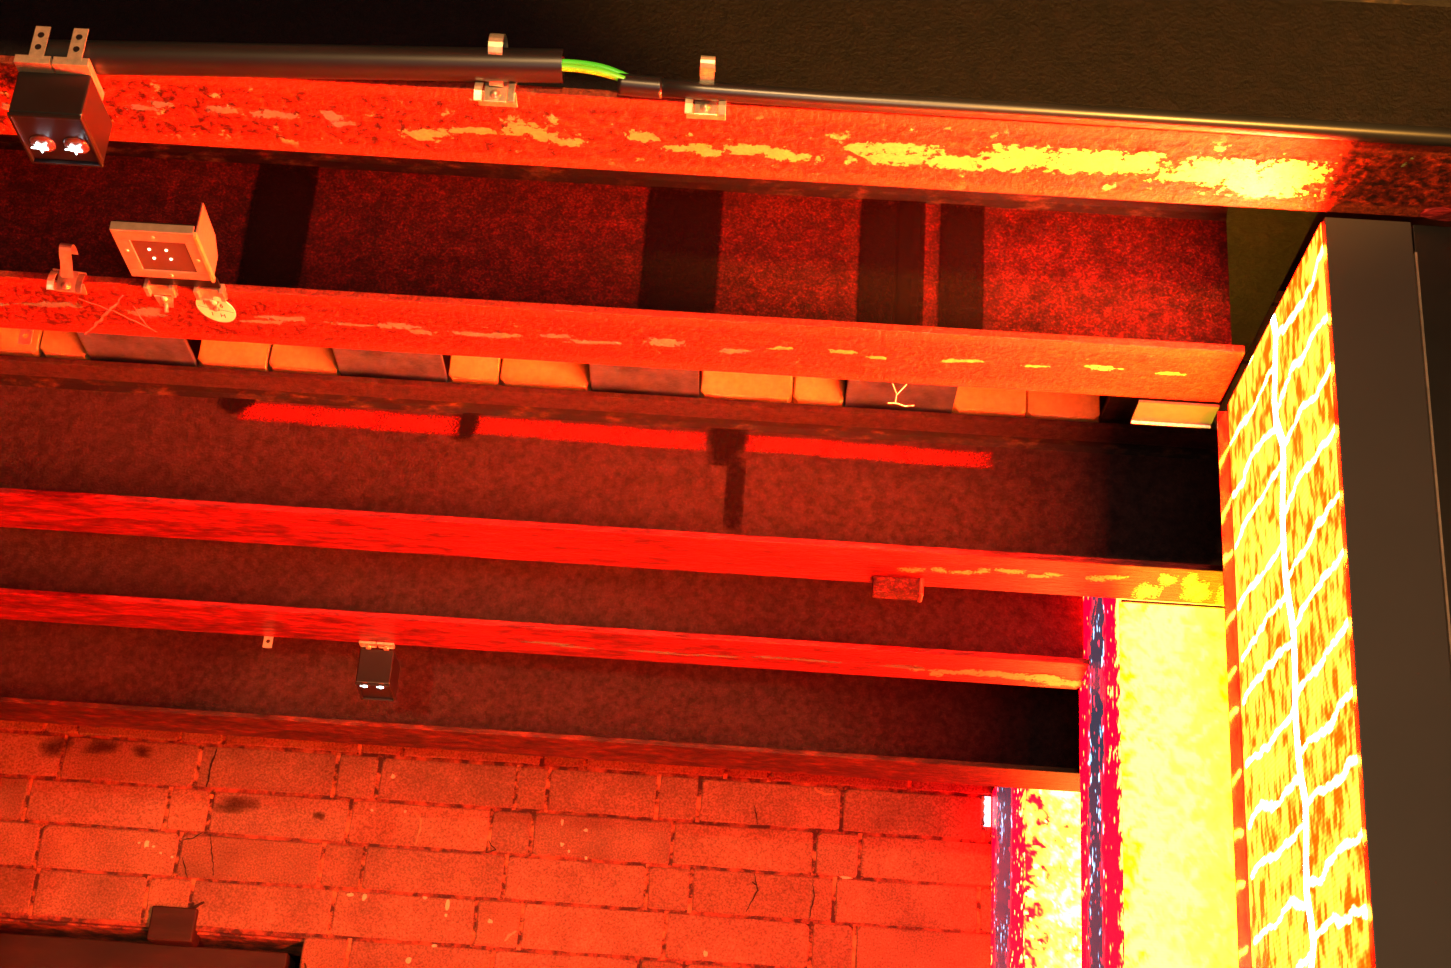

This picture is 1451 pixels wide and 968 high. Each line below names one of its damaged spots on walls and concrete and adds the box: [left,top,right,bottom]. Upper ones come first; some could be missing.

peeling [396,121,588,147]
peeling [623,129,825,163]
peeling [844,141,1338,199]
rust [1420,207,1451,222]